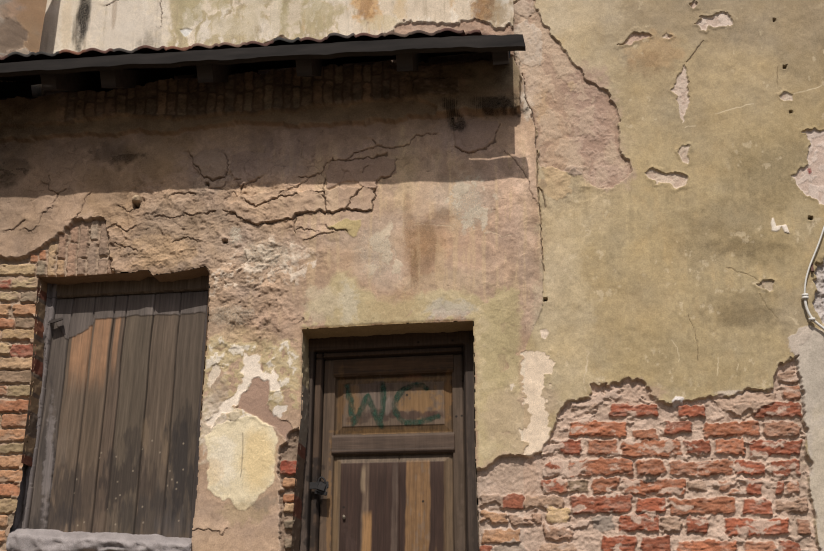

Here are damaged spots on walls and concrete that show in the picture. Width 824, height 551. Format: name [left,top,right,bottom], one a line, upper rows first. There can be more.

water stain [77,0,90,51]
peeling [689,0,734,31]
spalling [384,0,633,189]
crack [5,174,67,233]
crack [107,204,138,272]
crack [155,132,437,243]
crack [454,72,547,271]
peeling [645,144,691,189]
peeling [791,127,824,205]
spalling [0,216,116,551]
spalling [206,352,301,551]
spalling [476,327,820,551]